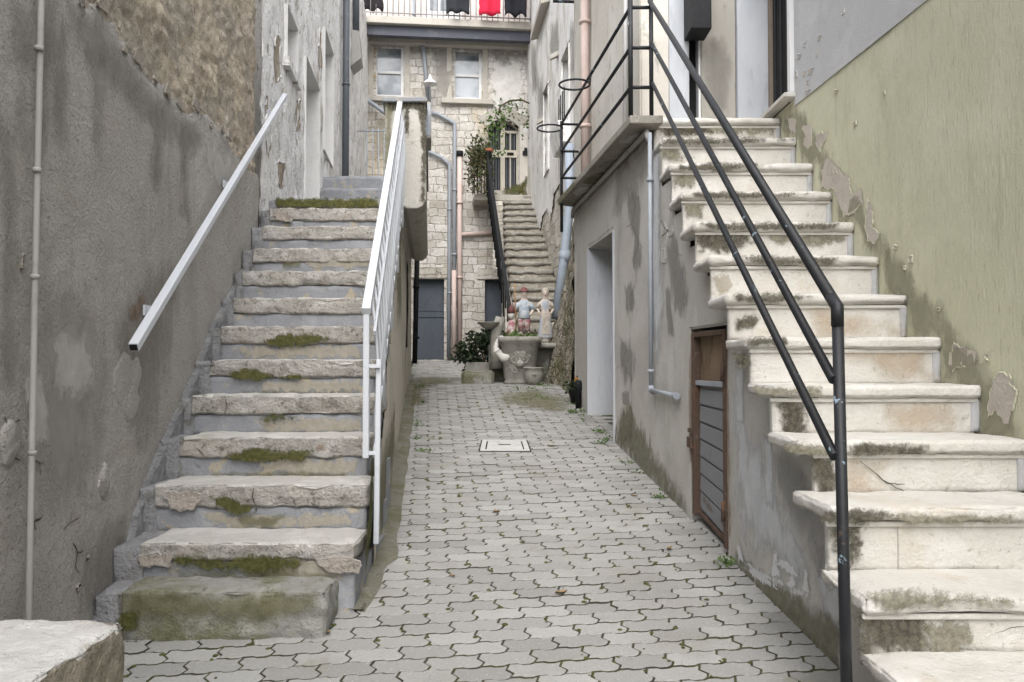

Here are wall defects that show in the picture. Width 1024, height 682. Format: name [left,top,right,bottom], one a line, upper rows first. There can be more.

spalling [79,0,285,190]
peeling [788,118,881,245]
damp [615,142,663,362]
damp [620,406,633,442]
crack [860,461,903,491]
peeling [987,371,1018,424]